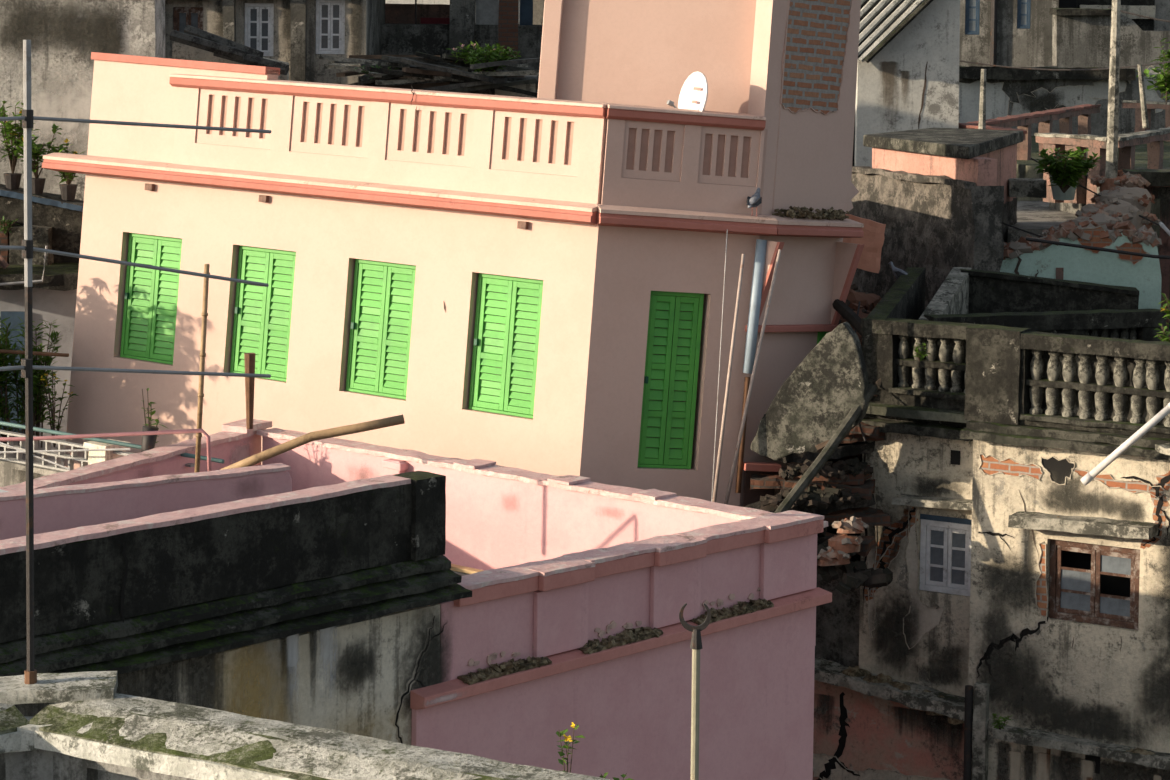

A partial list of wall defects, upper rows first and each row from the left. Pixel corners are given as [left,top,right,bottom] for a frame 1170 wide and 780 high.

flaking render [780,0,852,114]
spalling [978,453,1170,499]
water stain [1046,478,1143,521]
crack [1121,470,1170,549]
spalling [867,506,944,649]
spalling [1035,542,1048,623]
water stain [116,627,373,718]
crack [393,615,448,744]
crack [974,616,1074,679]
water stain [979,534,1170,743]
crack [817,692,860,780]
water stain [997,742,1170,780]